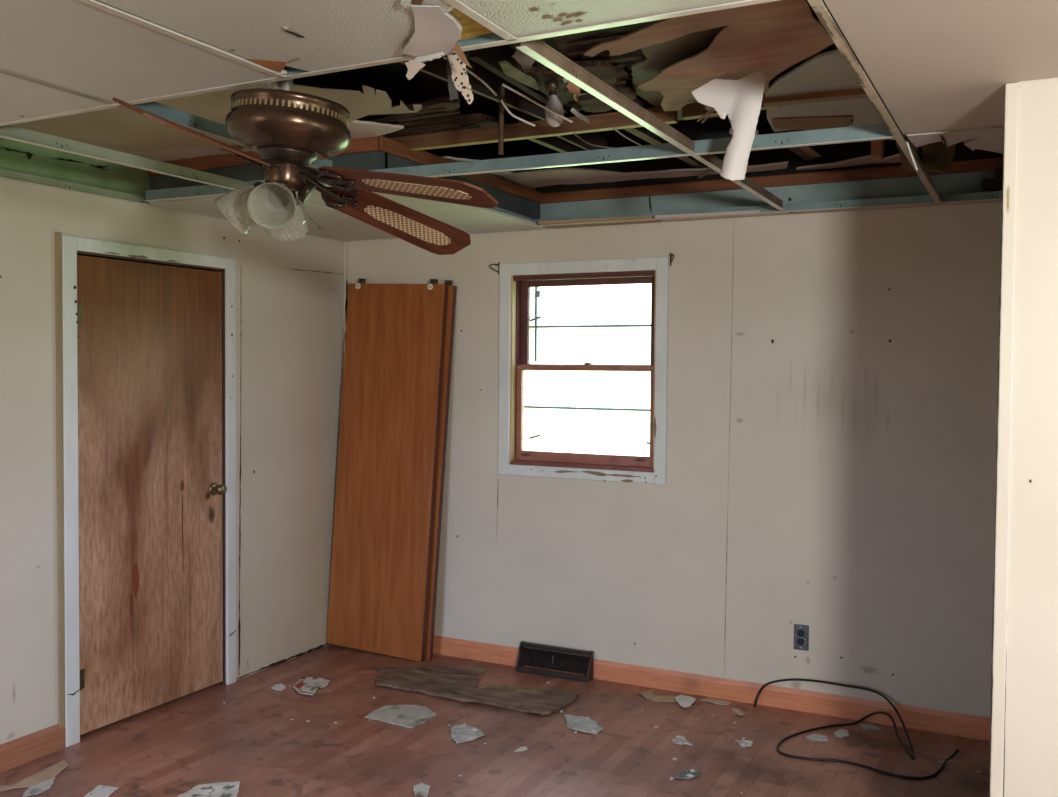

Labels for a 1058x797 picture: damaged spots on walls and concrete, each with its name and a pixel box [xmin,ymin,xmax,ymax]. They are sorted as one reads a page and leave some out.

peeling [154,58,422,125]
peeling [11,107,246,152]
peeling [531,469,657,483]